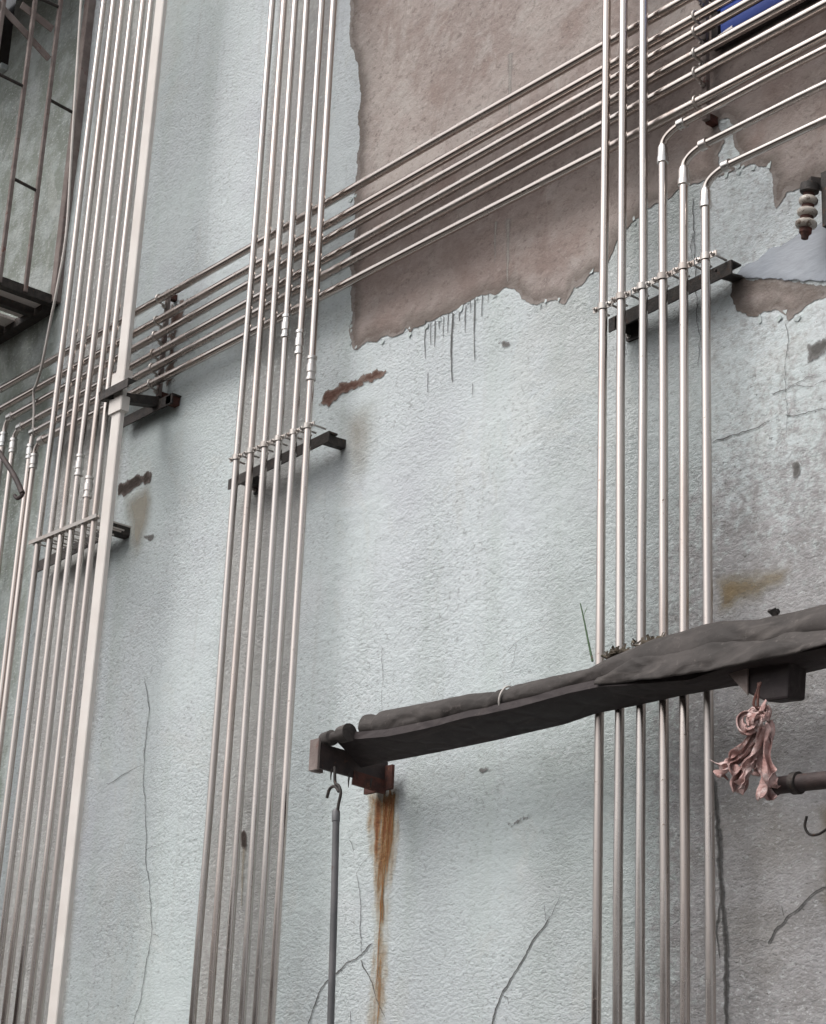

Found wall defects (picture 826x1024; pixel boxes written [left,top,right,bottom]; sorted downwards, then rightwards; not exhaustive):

peeling [348,0,826,350]
water stain [424,293,489,381]
crack [308,840,386,1024]
rust [368,790,395,1024]
crack [492,897,560,1024]
crack [714,778,826,1024]